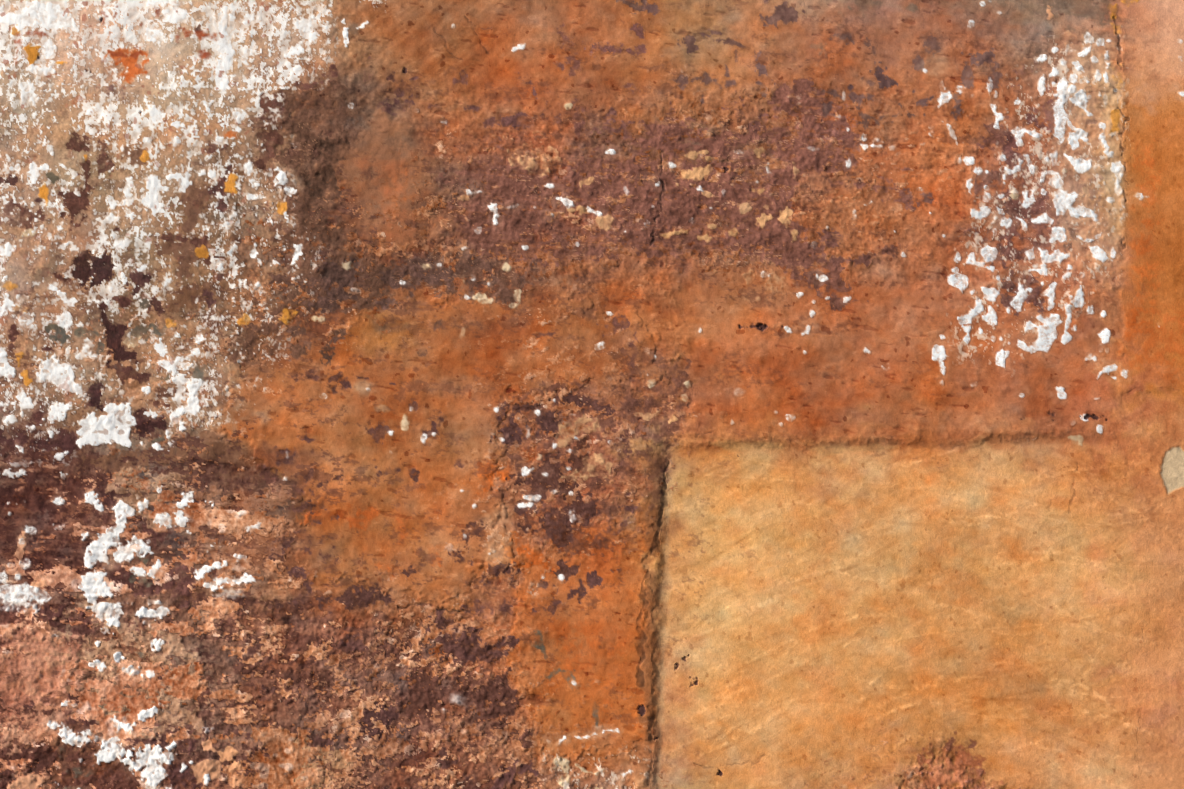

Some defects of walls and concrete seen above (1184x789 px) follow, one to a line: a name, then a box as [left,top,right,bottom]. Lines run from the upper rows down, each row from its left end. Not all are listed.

damp [0,130,239,363]
rust [335,140,441,252]
peeling [917,30,1150,386]
rust [1109,101,1184,394]
damp [257,432,395,615]
damp [364,421,393,446]
spalling [0,0,935,789]
rust [474,457,511,498]
rust [574,523,637,587]
peeling [1046,386,1108,447]
damp [0,730,208,789]
spalling [914,730,1035,789]